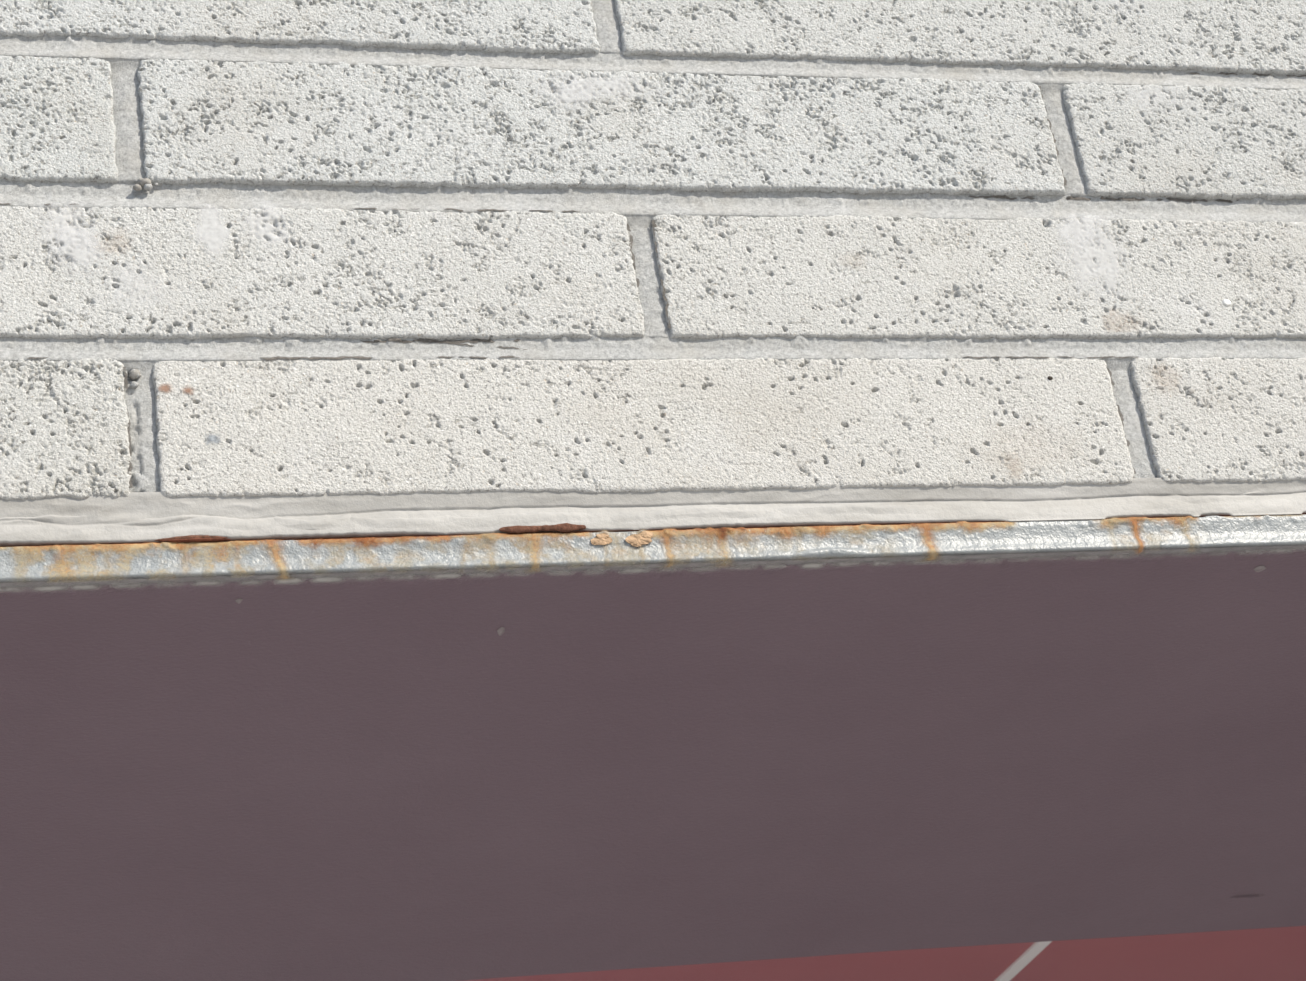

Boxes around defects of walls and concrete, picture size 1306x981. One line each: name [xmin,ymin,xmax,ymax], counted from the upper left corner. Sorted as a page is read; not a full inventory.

rust [0,539,288,582]
rust [298,532,590,571]
rust [645,521,1014,567]
rust [1101,516,1196,553]